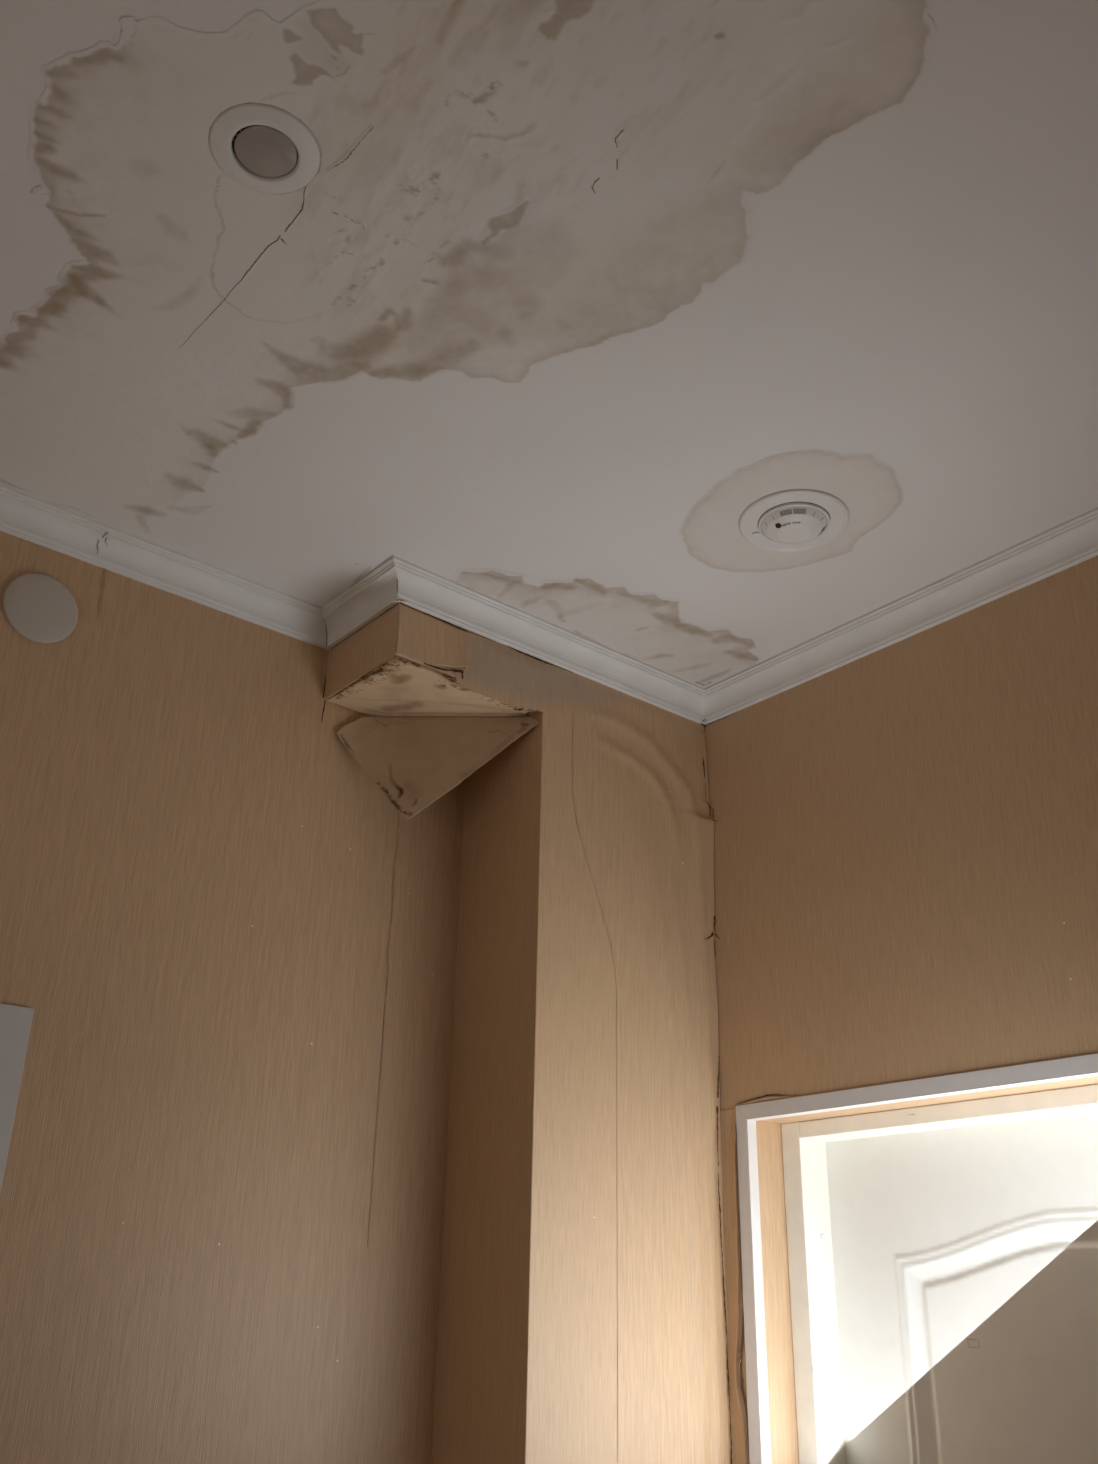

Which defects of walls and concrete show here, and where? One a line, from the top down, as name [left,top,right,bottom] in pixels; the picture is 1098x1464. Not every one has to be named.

crack [189,125,373,338]
water stain [0,0,938,538]
water stain [680,449,905,573]
water stain [452,568,763,688]